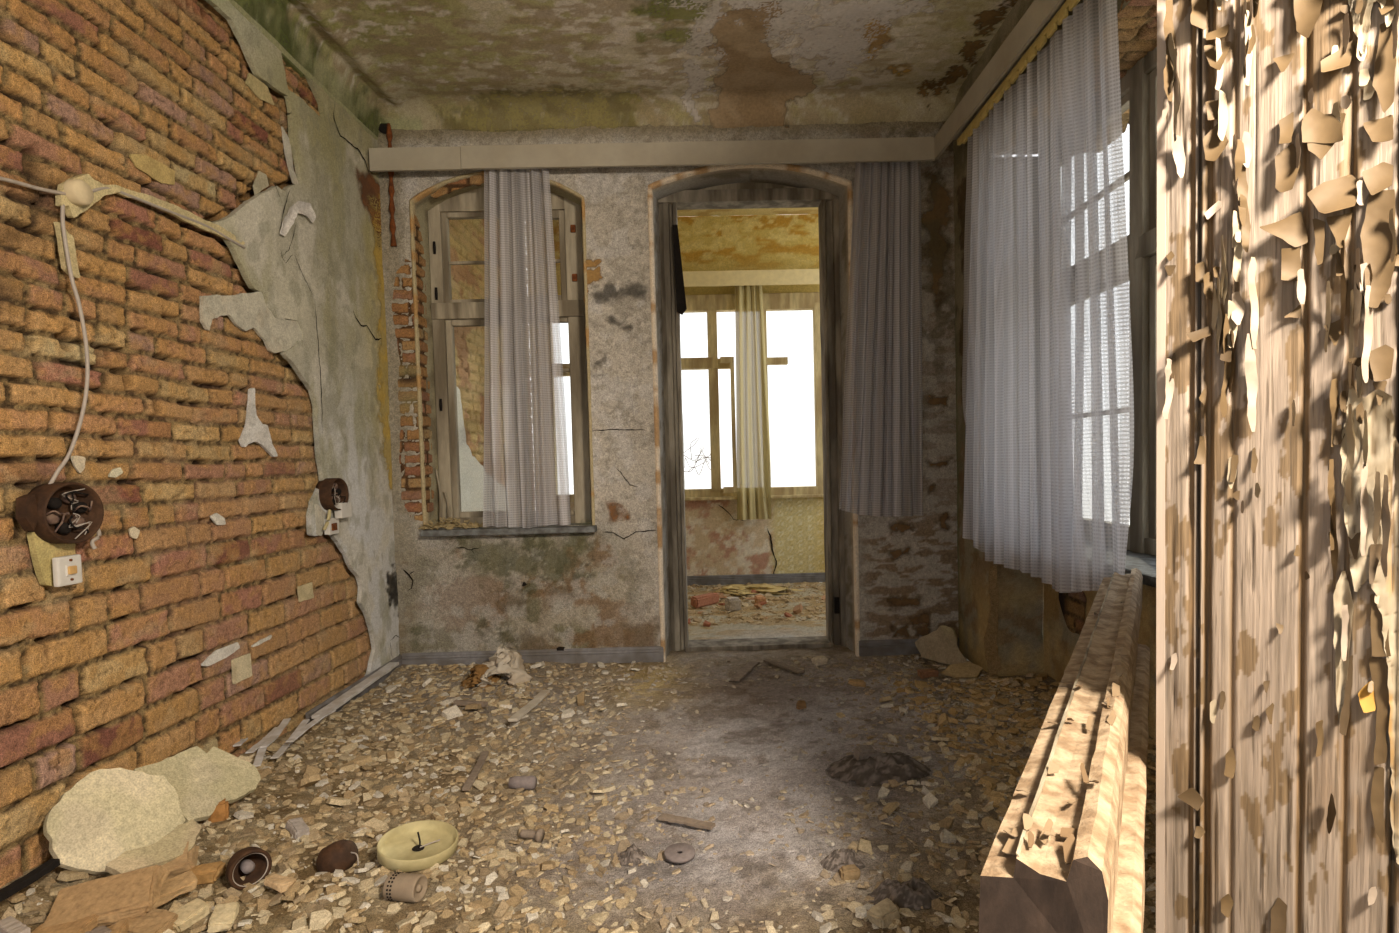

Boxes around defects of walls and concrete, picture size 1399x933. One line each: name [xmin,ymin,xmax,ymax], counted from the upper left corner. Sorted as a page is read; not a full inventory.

damp [234,0,319,80]
damp [632,0,705,42]
peeling [658,0,948,129]
damp [863,19,911,76]
peeling [917,0,1018,107]
damp [355,88,385,137]
damp [444,86,640,132]
spalling [392,215,434,521]
spalling [0,0,371,888]
peeling [1162,0,1399,864]
peeling [1270,898,1287,933]
peeling [1368,887,1377,906]